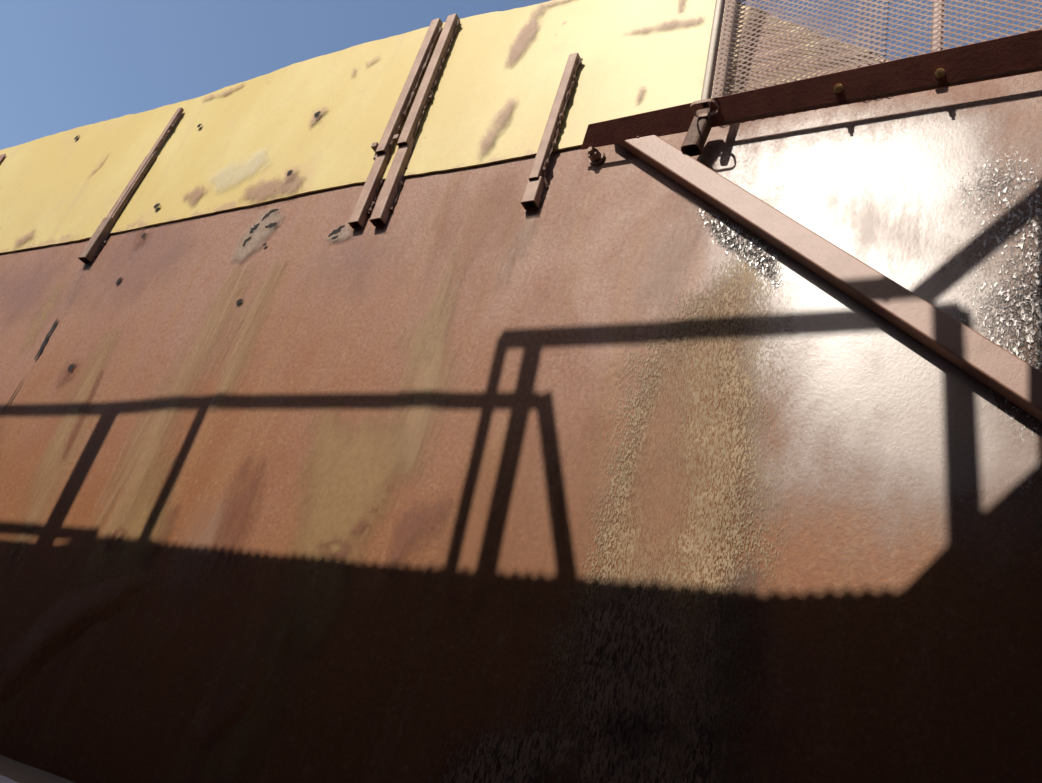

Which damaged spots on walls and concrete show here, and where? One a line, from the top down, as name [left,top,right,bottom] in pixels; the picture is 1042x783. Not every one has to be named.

rust [507,0,565,63]
rust [481,100,514,152]
rust [244,169,302,200]
spalling [243,209,279,247]
rust [11,338,109,554]